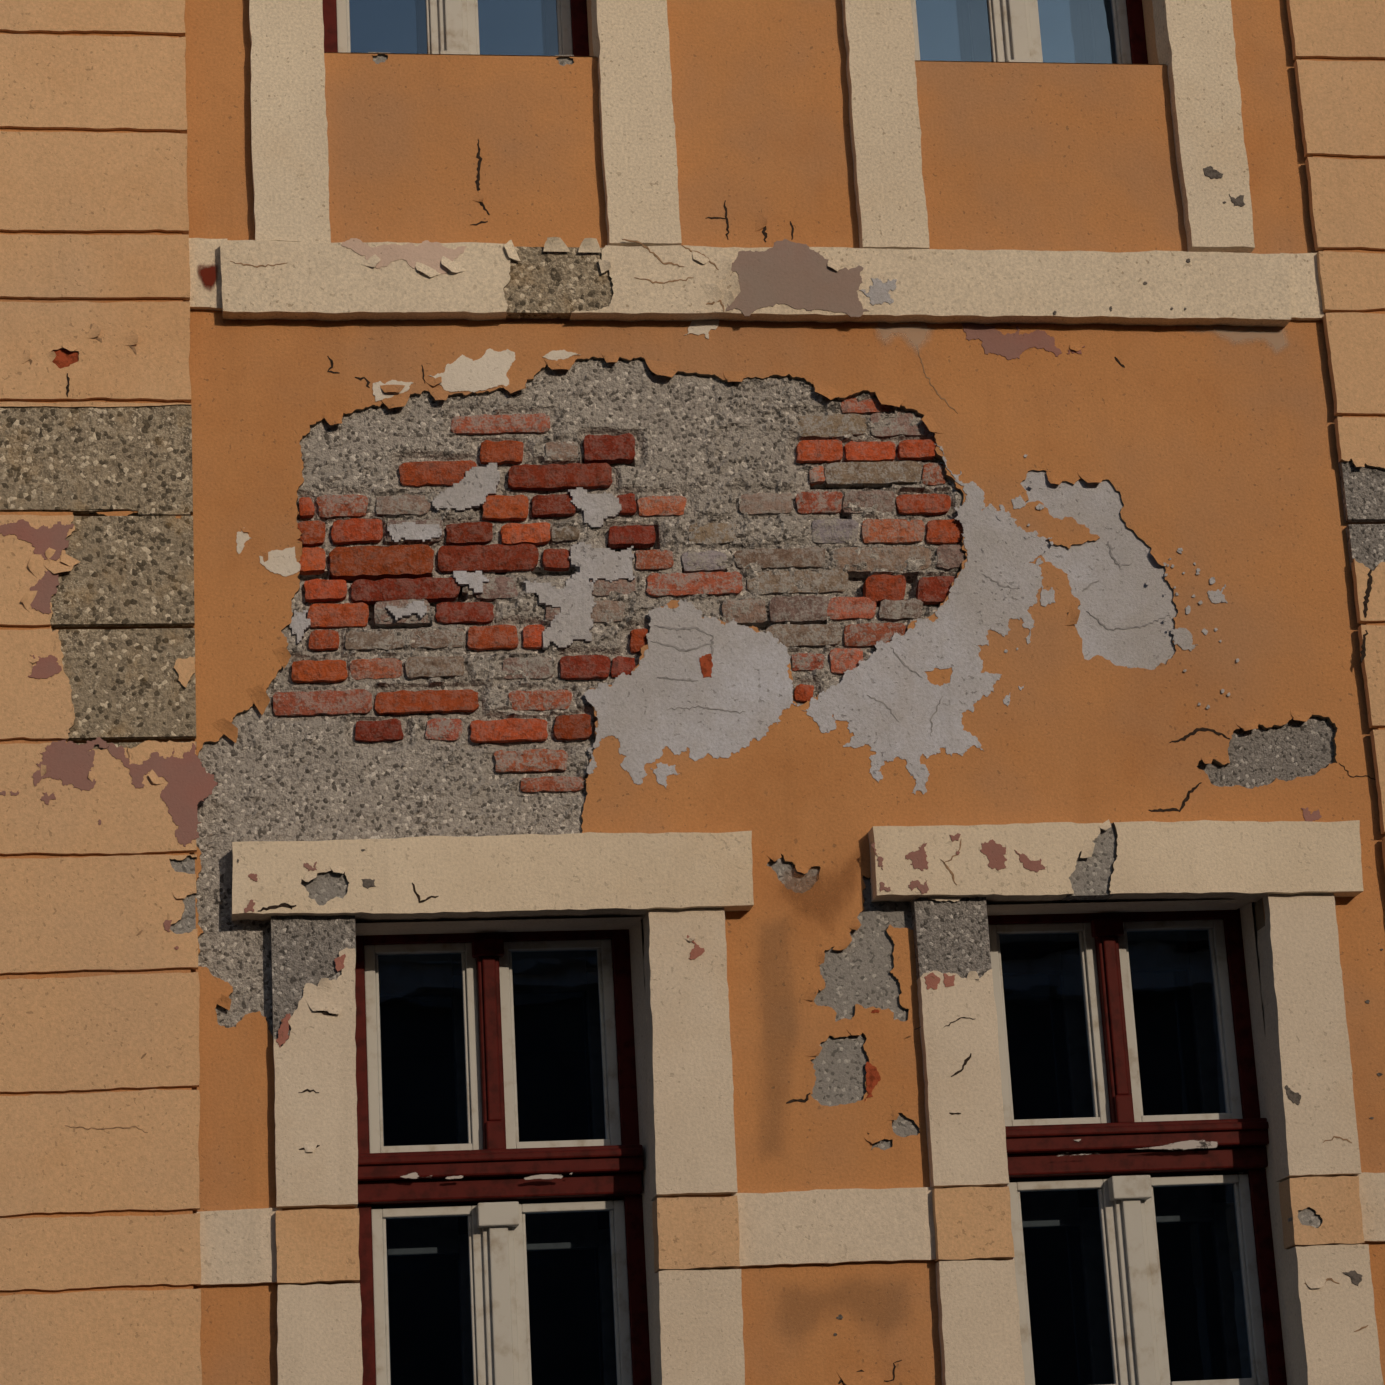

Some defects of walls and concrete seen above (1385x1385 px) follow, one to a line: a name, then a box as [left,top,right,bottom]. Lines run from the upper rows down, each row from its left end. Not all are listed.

crack [471,139,490,226]
flaking render [503,237,613,319]
peeling [962,323,1085,360]
flaking render [1338,458,1385,571]
crack [1360,569,1373,663]
flaking render [0,349,1228,1047]
crack [1148,782,1201,812]
crack [1169,727,1230,743]
flaking render [1196,710,1335,789]
crack [1339,763,1376,780]
flaking render [803,842,992,1107]
crack [837,1360,902,1385]